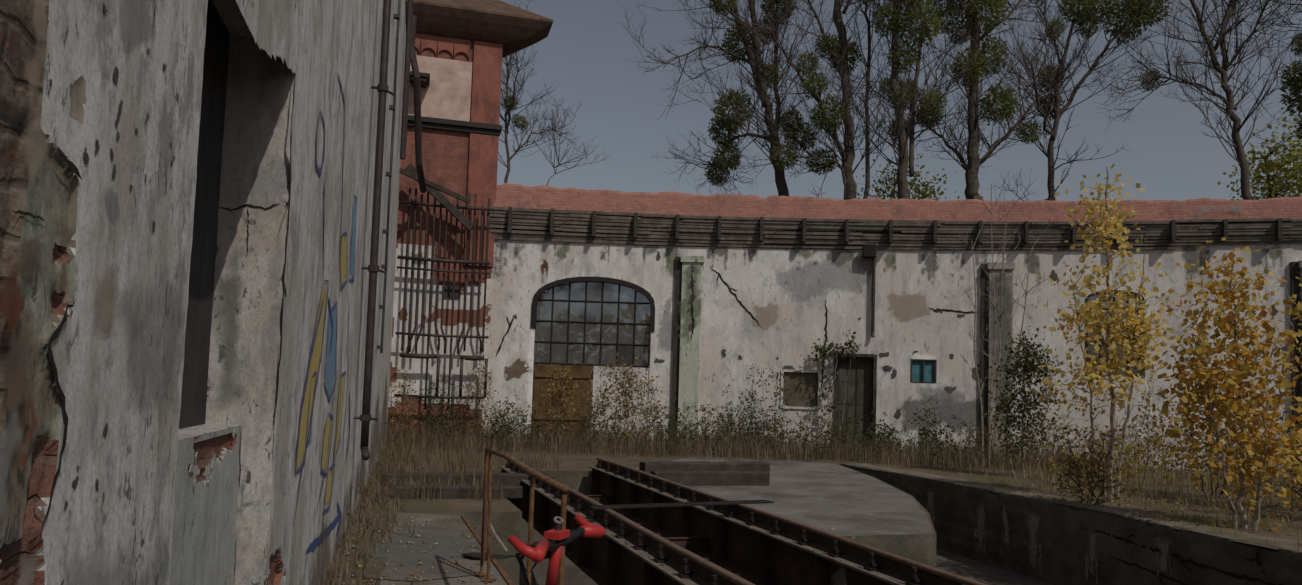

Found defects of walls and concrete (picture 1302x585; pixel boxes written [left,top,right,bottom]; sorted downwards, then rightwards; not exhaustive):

peeling [0,0,138,585]
crack [220,78,295,424]
peeling [388,243,530,410]
crack [687,269,760,339]
spalling [188,427,237,493]